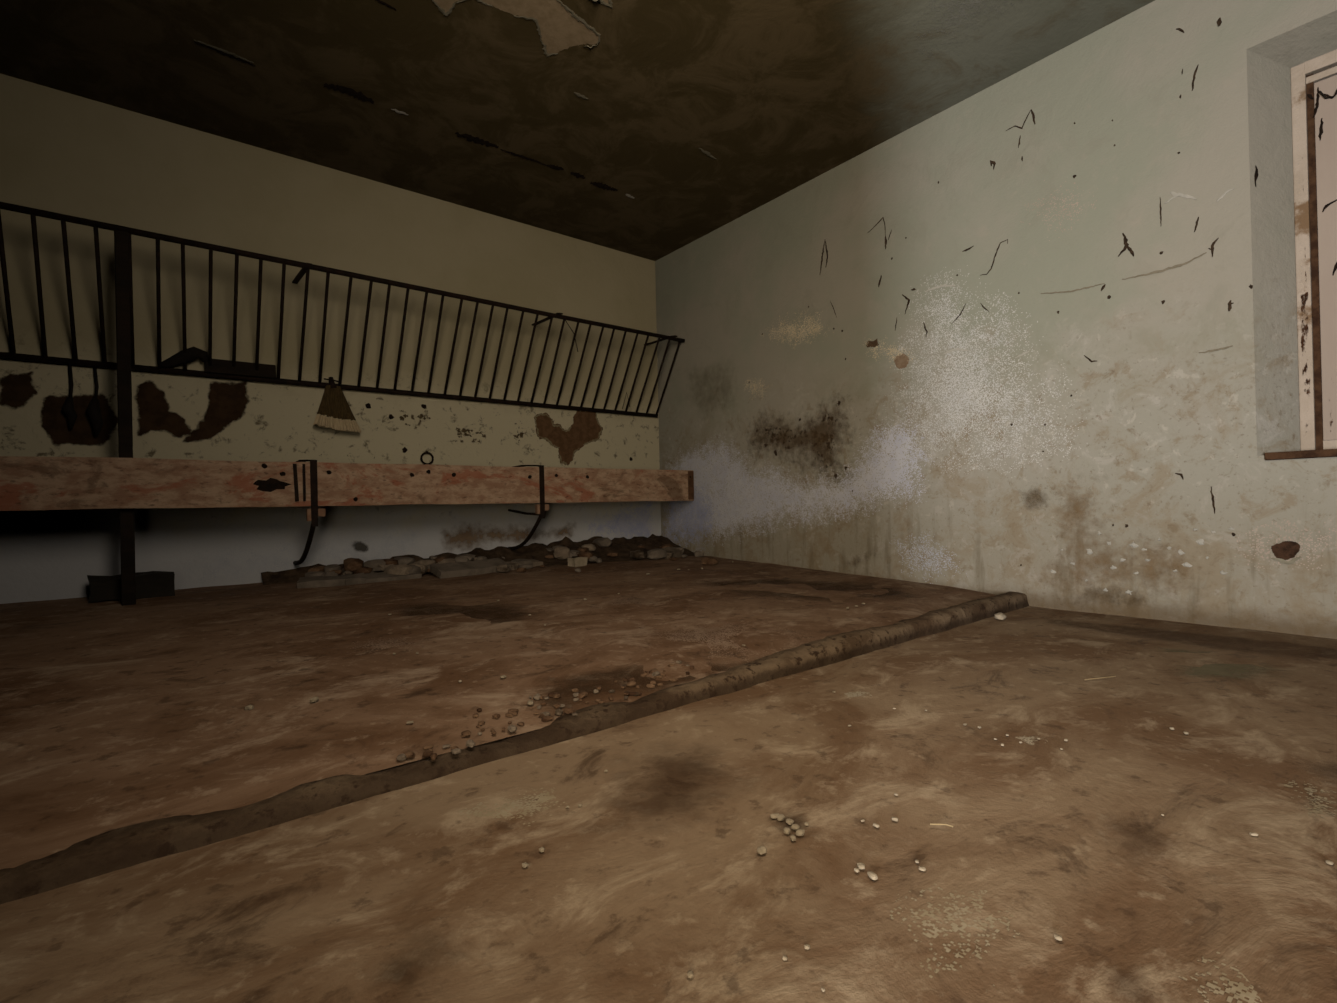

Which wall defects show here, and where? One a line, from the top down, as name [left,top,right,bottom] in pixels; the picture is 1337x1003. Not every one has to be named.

peeling [432,0,601,57]
leakage [586,265,1088,551]
peeling [513,411,603,465]
leakage [445,526,536,547]
spalling [1271,541,1301,564]